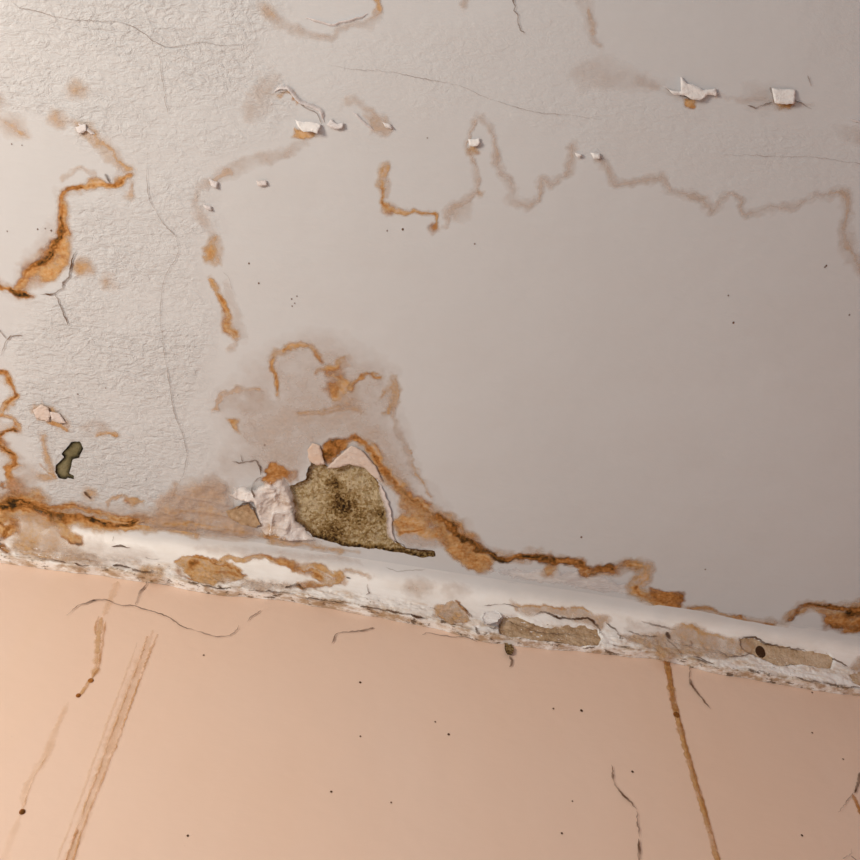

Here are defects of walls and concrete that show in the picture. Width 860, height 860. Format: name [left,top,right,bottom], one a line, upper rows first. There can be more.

water stain [0,123,133,299]
flaking render [55,442,83,479]
water stain [0,370,252,563]
flaking render [226,443,435,558]
water stain [257,342,745,620]
crack [67,545,516,643]
peeling [482,604,608,667]
water stain [626,623,754,661]
peeling [739,636,833,669]
water stain [788,602,860,633]
rust [664,661,710,827]
crack [612,767,641,860]